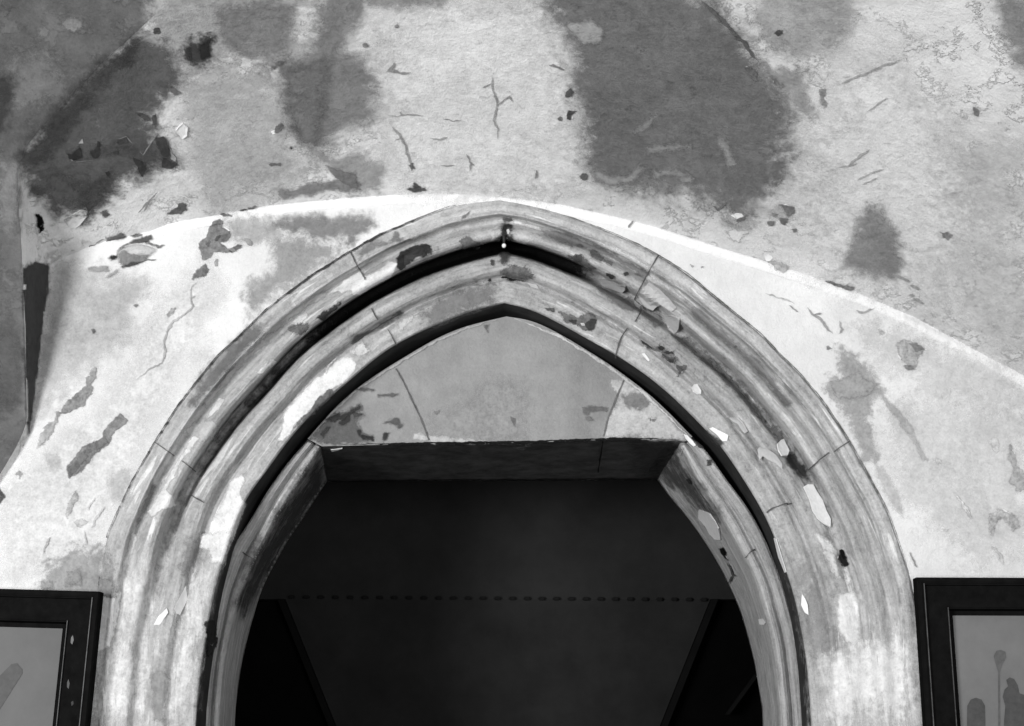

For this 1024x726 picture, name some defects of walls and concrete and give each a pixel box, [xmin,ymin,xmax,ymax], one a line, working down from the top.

spalling [133,112,188,177]
water stain [15,0,444,221]
crack [483,74,513,139]
water stain [545,0,812,218]
peeling [192,206,257,280]
peeling [396,244,438,270]
water stain [845,206,903,278]
peeling [37,367,97,448]
peeling [66,412,128,480]
crack [84,205,470,545]
water stain [825,345,926,514]
peeling [803,484,831,527]